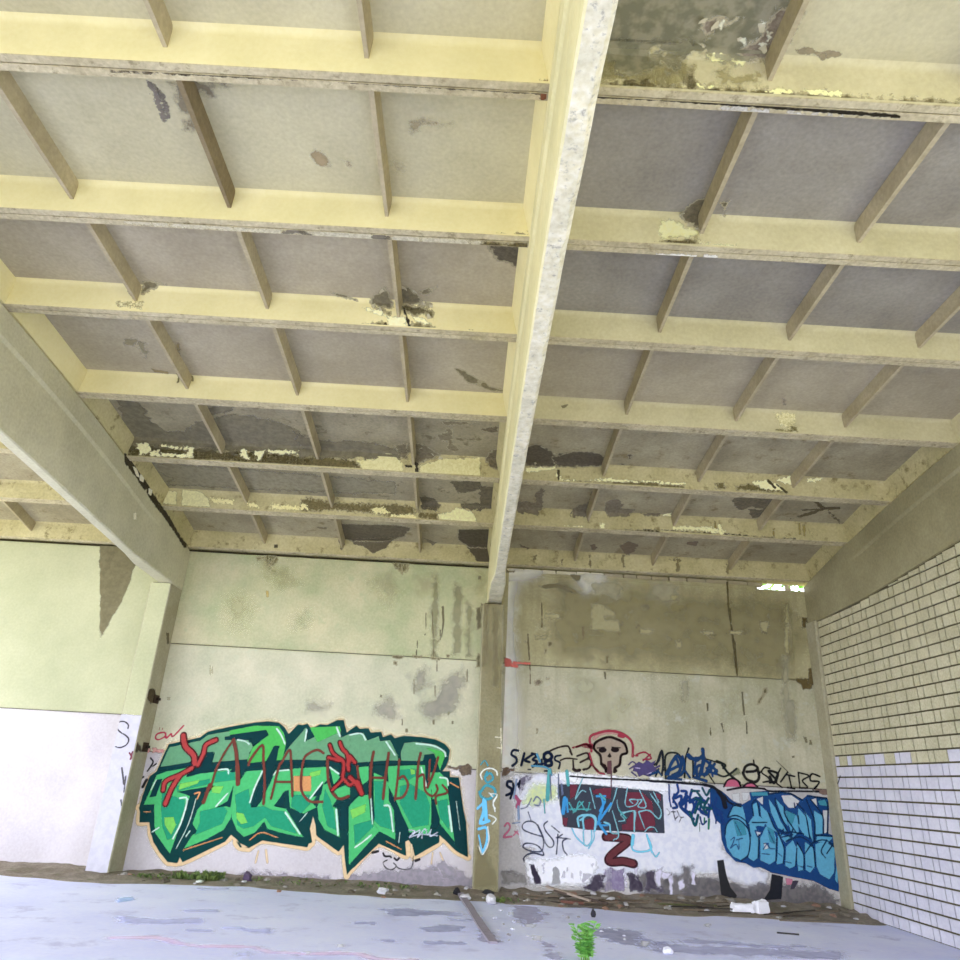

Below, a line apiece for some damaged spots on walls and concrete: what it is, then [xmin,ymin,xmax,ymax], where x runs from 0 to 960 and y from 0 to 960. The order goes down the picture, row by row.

peeling [698,7,787,66]
spalling [602,71,960,104]
damp [311,151,328,166]
peeling [654,198,731,258]
spalling [330,286,437,328]
peeling [773,411,798,432]
spalling [124,420,499,548]
peeling [524,444,686,488]
spalling [714,476,791,494]
spalling [271,496,489,562]
damp [99,545,136,635]